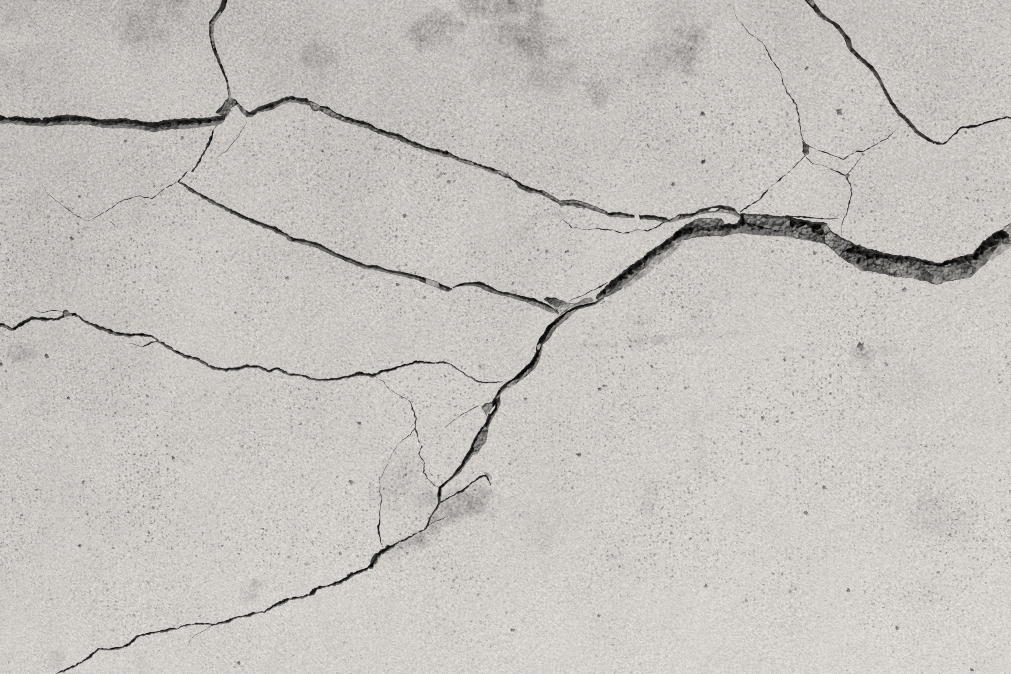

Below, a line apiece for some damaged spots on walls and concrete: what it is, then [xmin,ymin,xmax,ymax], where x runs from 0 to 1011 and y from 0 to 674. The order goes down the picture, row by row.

crack [0,0,1011,532]
crack [56,489,417,674]